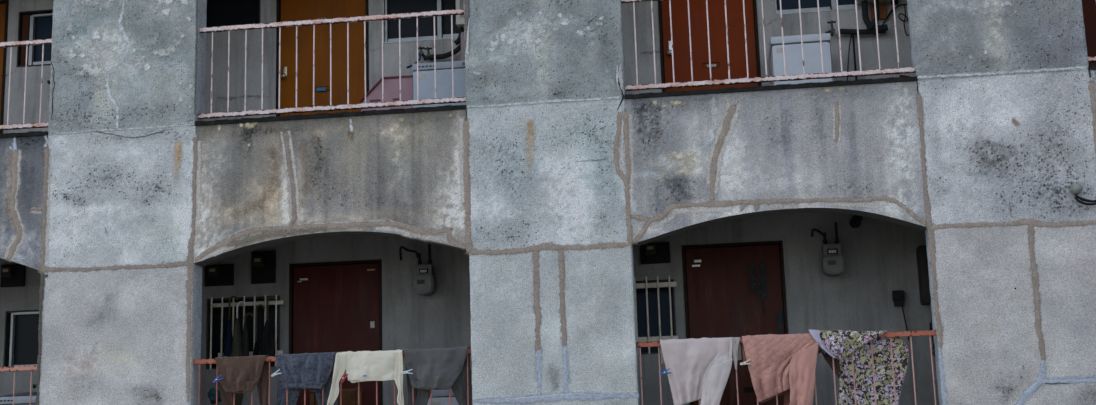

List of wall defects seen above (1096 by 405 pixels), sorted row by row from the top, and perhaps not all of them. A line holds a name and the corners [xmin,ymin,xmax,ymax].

crack [5,150,25,261]
crack [30,79,1096,405]